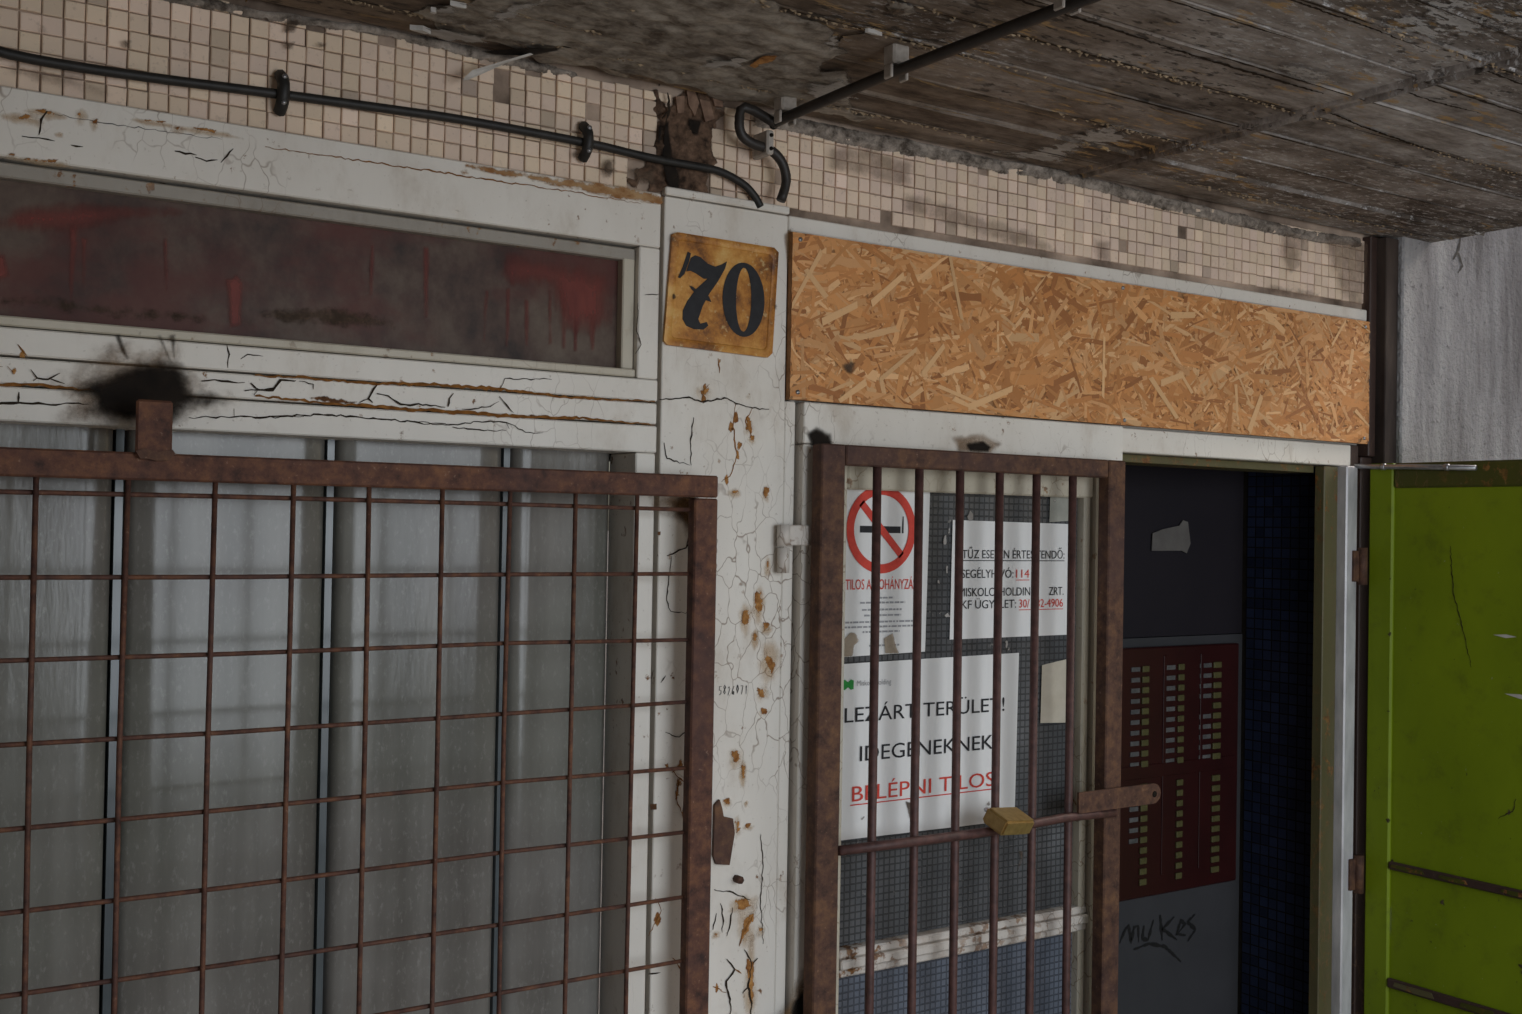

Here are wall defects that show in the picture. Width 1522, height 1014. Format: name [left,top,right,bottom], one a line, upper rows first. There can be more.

crack [22,111,640,204]
spalling [164,0,1362,247]
crack [635,294,658,354]
crack [0,345,89,406]
crack [189,346,552,434]
crack [660,359,769,484]
crack [666,540,688,614]
rust [742,591,770,641]
rust [735,899,762,935]
rust [746,959,754,1003]